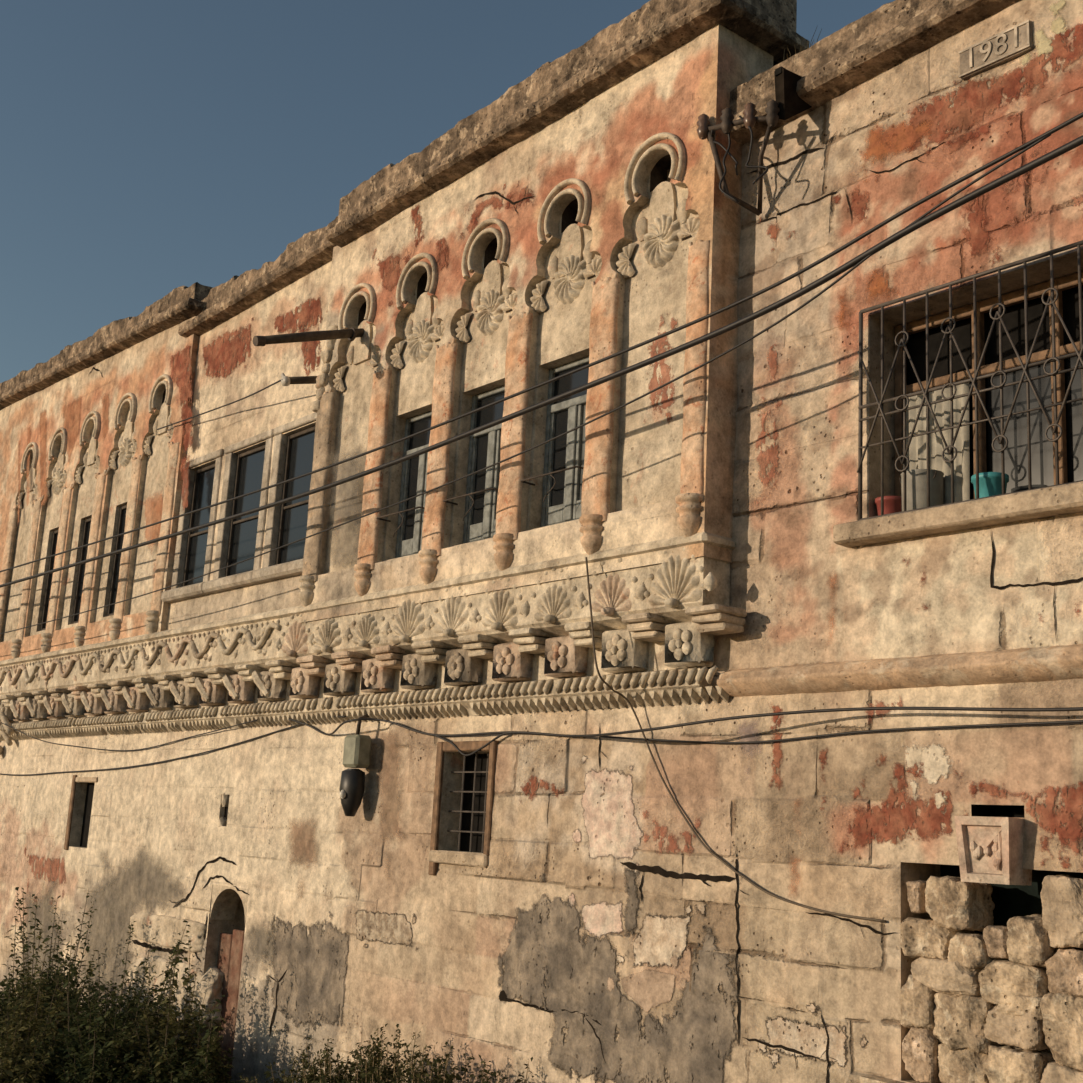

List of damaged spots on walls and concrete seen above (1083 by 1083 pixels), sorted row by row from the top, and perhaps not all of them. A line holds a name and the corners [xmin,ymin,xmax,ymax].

peeling [906,17,1083,156]
crack [476,191,534,216]
peeling [203,318,253,378]
peeling [839,755,953,853]
peeling [955,772,1083,869]
crack [132,856,249,962]
crack [268,970,287,1036]